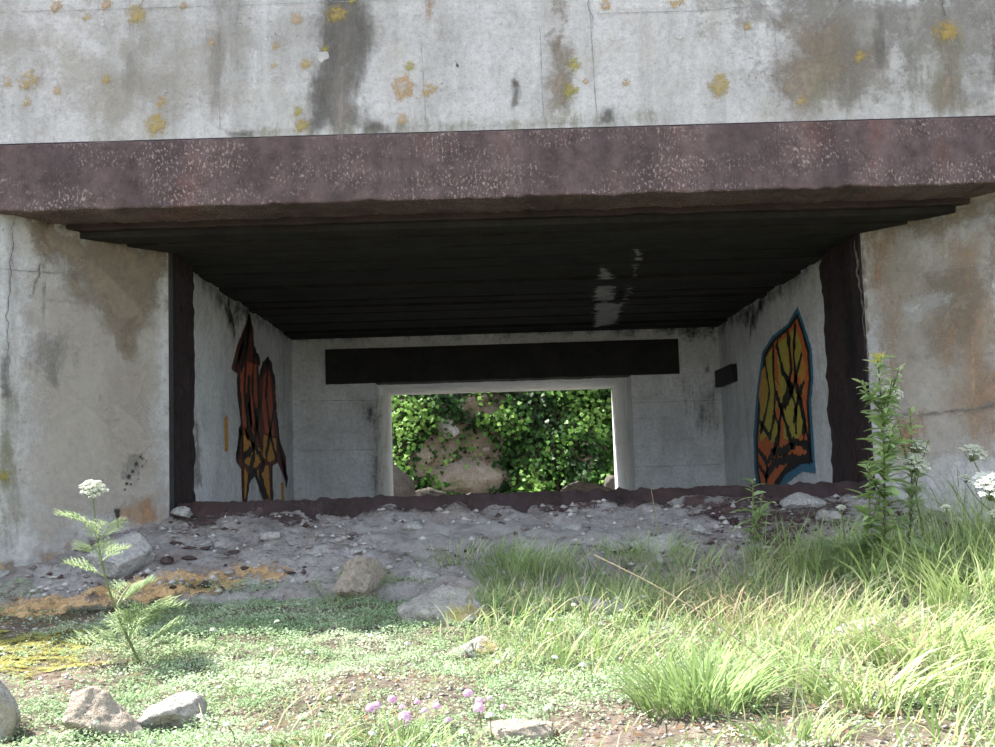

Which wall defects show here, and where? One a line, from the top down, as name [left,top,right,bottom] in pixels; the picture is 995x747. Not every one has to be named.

leakage [309,0,381,132]
leakage [547,33,577,126]
leakage [734,0,995,115]
corrosion [904,197,995,236]
crack [5,222,46,397]
spalling [594,268,631,327]
corrosion [883,233,995,468]